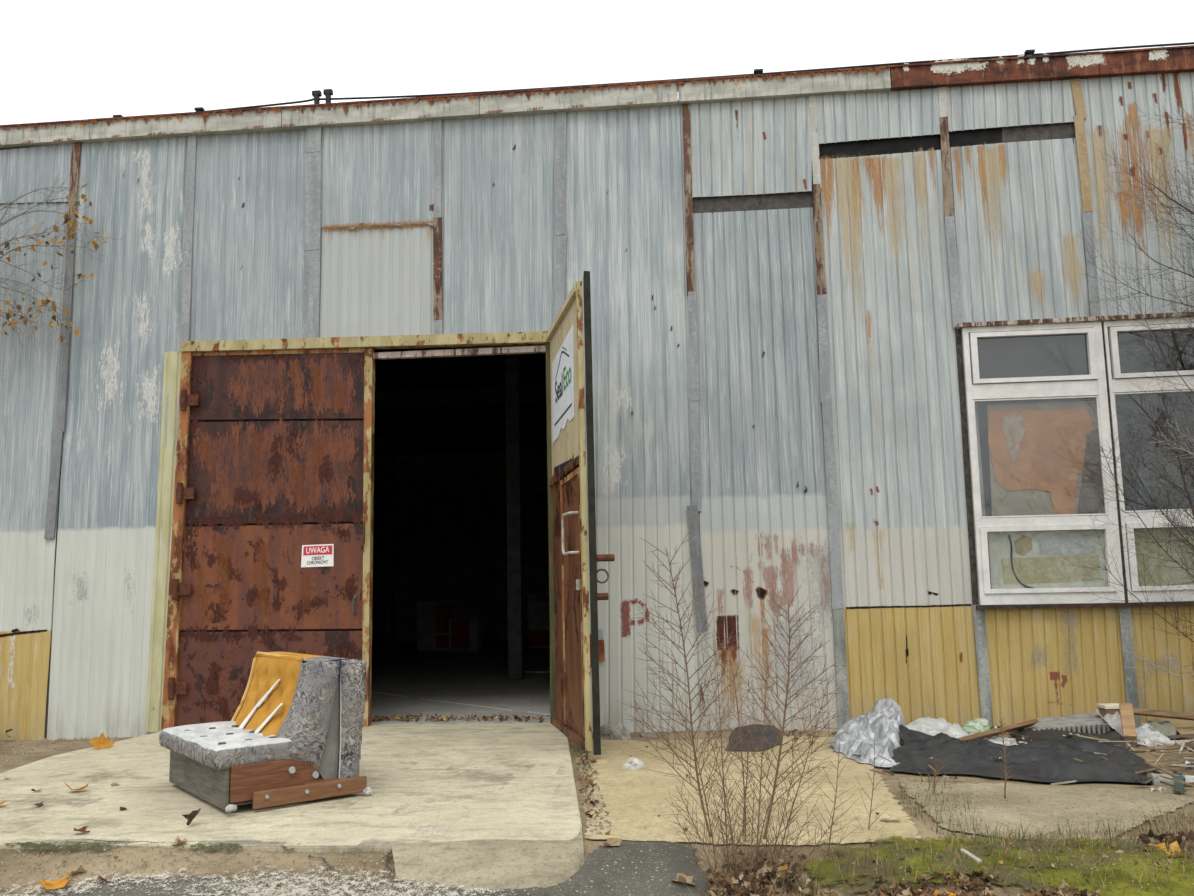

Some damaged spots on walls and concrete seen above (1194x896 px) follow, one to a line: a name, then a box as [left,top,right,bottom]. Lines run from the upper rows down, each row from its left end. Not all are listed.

peeling [930,53,1050,75]
peeling [1066,54,1106,69]
peeling [1149,46,1169,60]
corrosion [323,204,434,231]
corrosion [820,156,898,275]
corrosion [954,144,1006,225]
corrosion [1092,73,1194,247]
corrosion [185,354,363,542]
corrosion [179,625,296,645]
corrosion [716,599,769,704]